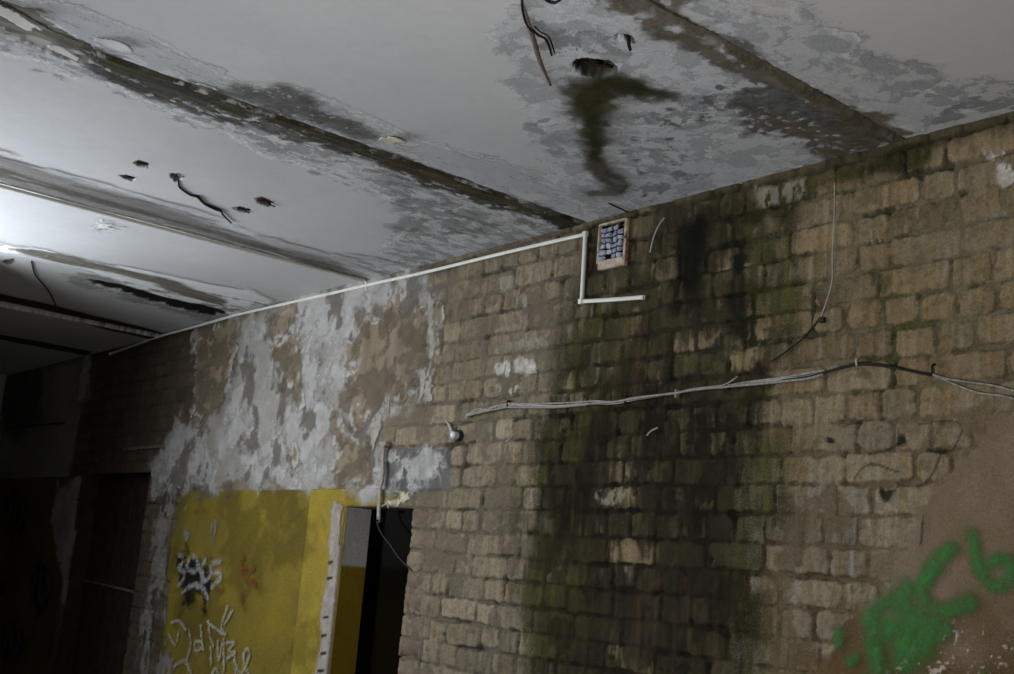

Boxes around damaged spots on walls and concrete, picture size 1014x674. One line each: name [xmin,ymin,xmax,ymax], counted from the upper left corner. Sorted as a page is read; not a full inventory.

damp [86,54,576,225]
peeling [0,0,1014,276]
peeling [0,243,306,437]
damp [512,0,1014,674]